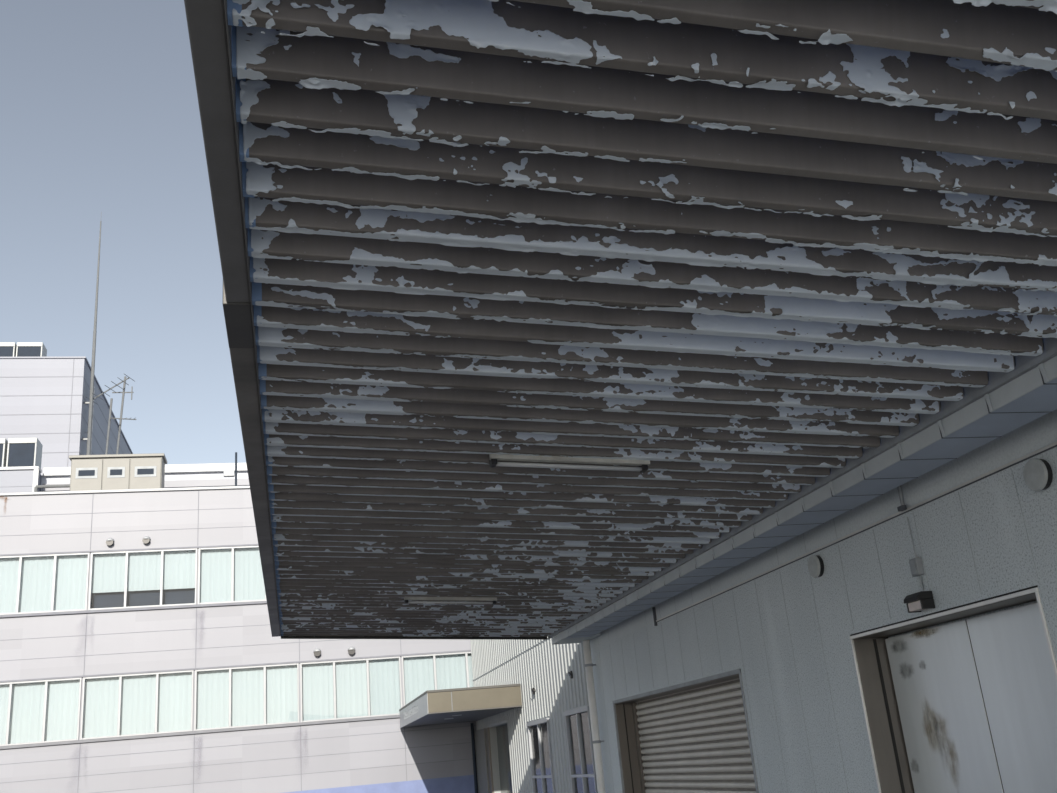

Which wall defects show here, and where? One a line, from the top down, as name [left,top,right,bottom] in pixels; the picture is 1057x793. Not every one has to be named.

peeling [232,0,1057,637]